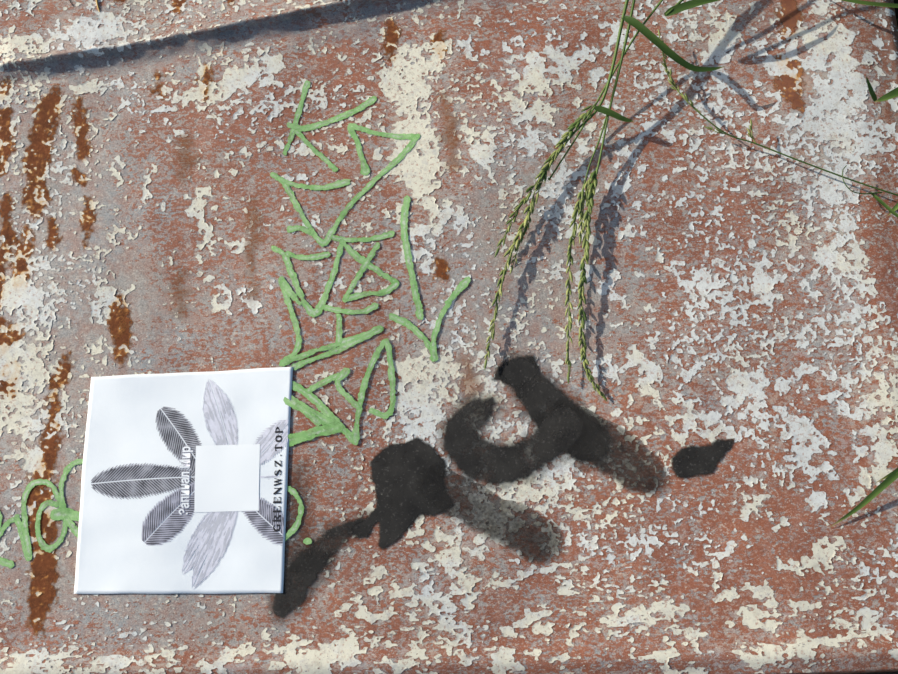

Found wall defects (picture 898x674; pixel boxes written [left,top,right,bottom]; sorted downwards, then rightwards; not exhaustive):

corrosion [0,77,12,95]
corrosion [775,0,803,41]
corrosion [773,55,805,113]
corrosion [0,373,19,399]
corrosion [0,84,96,346]
corrosion [26,351,72,635]
corrosion [106,292,133,364]
peeling [0,0,657,522]
peeling [0,445,898,674]
peeling [580,0,898,533]